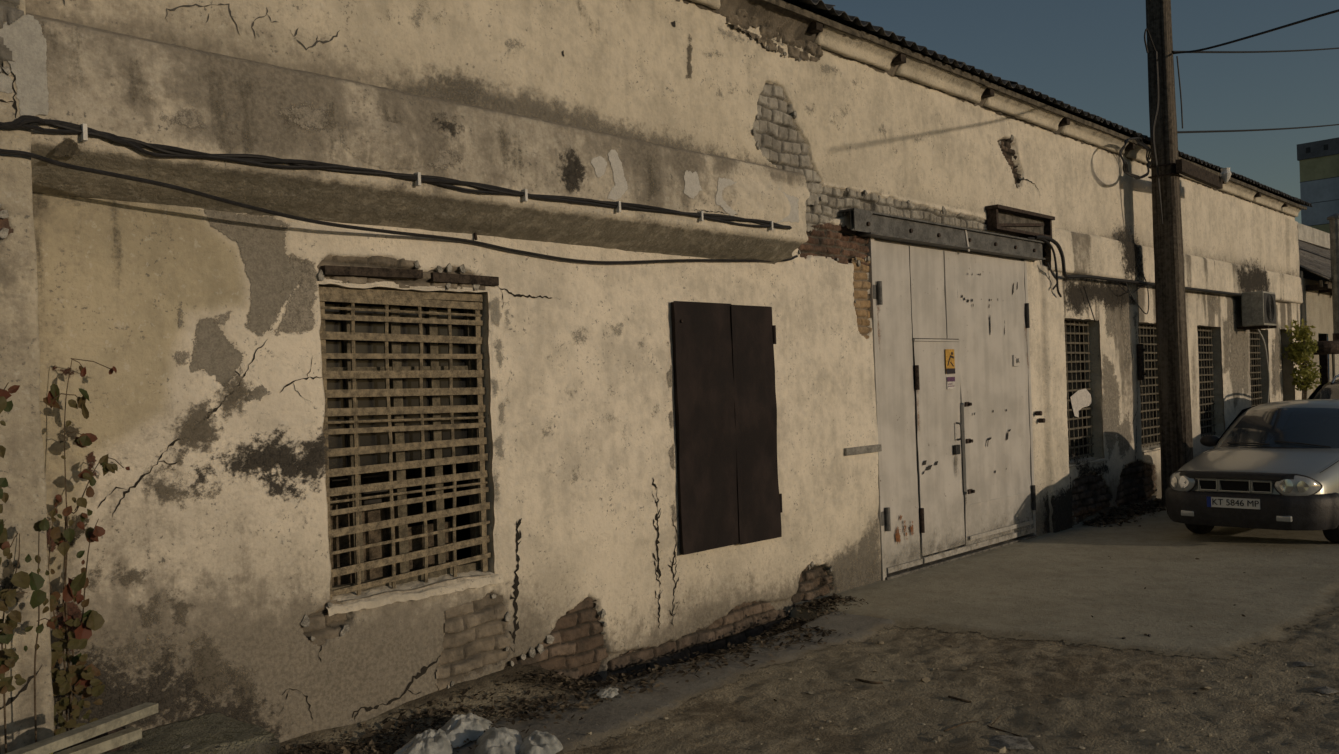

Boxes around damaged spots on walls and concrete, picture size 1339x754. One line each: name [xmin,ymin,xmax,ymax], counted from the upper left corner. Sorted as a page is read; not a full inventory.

crack [165,3,340,50]
damp [393,73,728,158]
damp [559,149,587,192]
flaking render [719,83,1045,339]
damp [1062,226,1145,315]
flaking render [173,302,243,386]
crack [281,357,322,402]
flaking render [204,209,510,457]
crack [97,439,180,513]
damp [144,370,333,508]
crack [509,518,522,652]
flaking render [436,561,834,691]